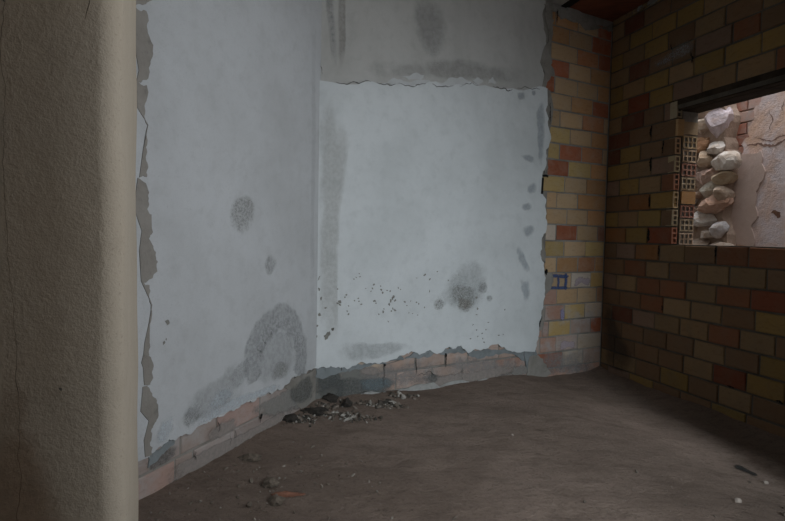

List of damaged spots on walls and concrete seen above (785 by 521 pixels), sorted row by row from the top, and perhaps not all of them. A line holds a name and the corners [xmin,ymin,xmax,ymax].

flaking render [540,4,613,131]
crack [0,3,22,519]
spalling [136,0,175,468]
flaking render [539,234,554,331]
spalling [175,297,587,481]